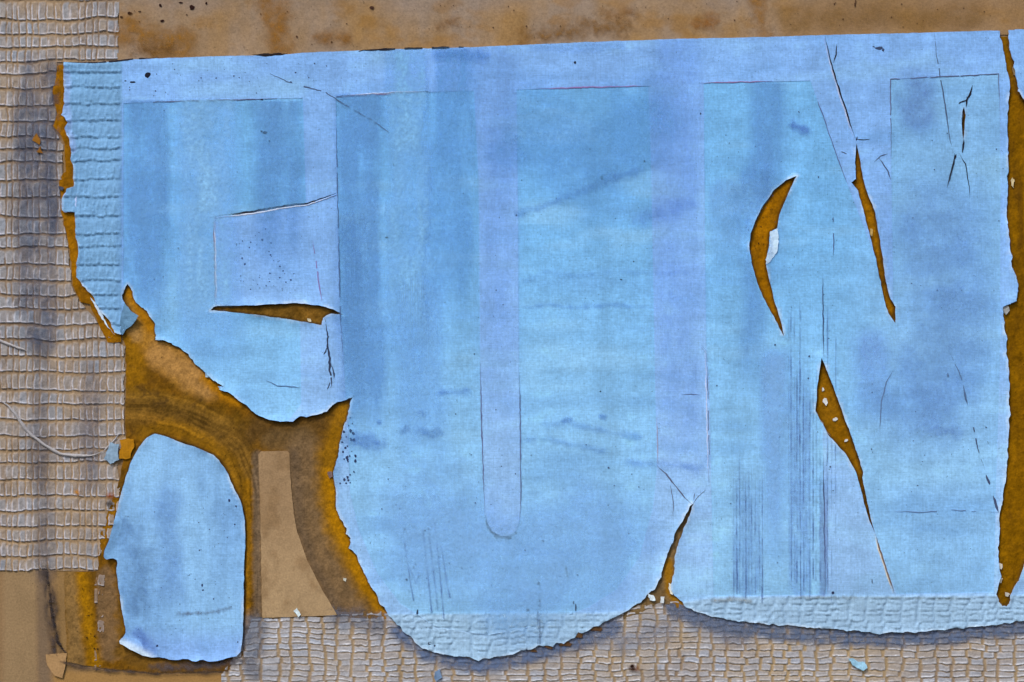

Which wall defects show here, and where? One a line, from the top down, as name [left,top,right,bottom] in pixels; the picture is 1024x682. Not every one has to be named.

crack [818,37,891,184]
crack [890,35,1000,199]
peeling [52,65,387,673]
crack [213,131,343,389]
peeling [748,176,796,345]
peeling [808,355,874,530]
peeling [851,145,895,322]
peeling [996,37,1024,606]
peeling [530,626,602,652]
peeling [619,503,694,619]
peeling [849,658,867,671]